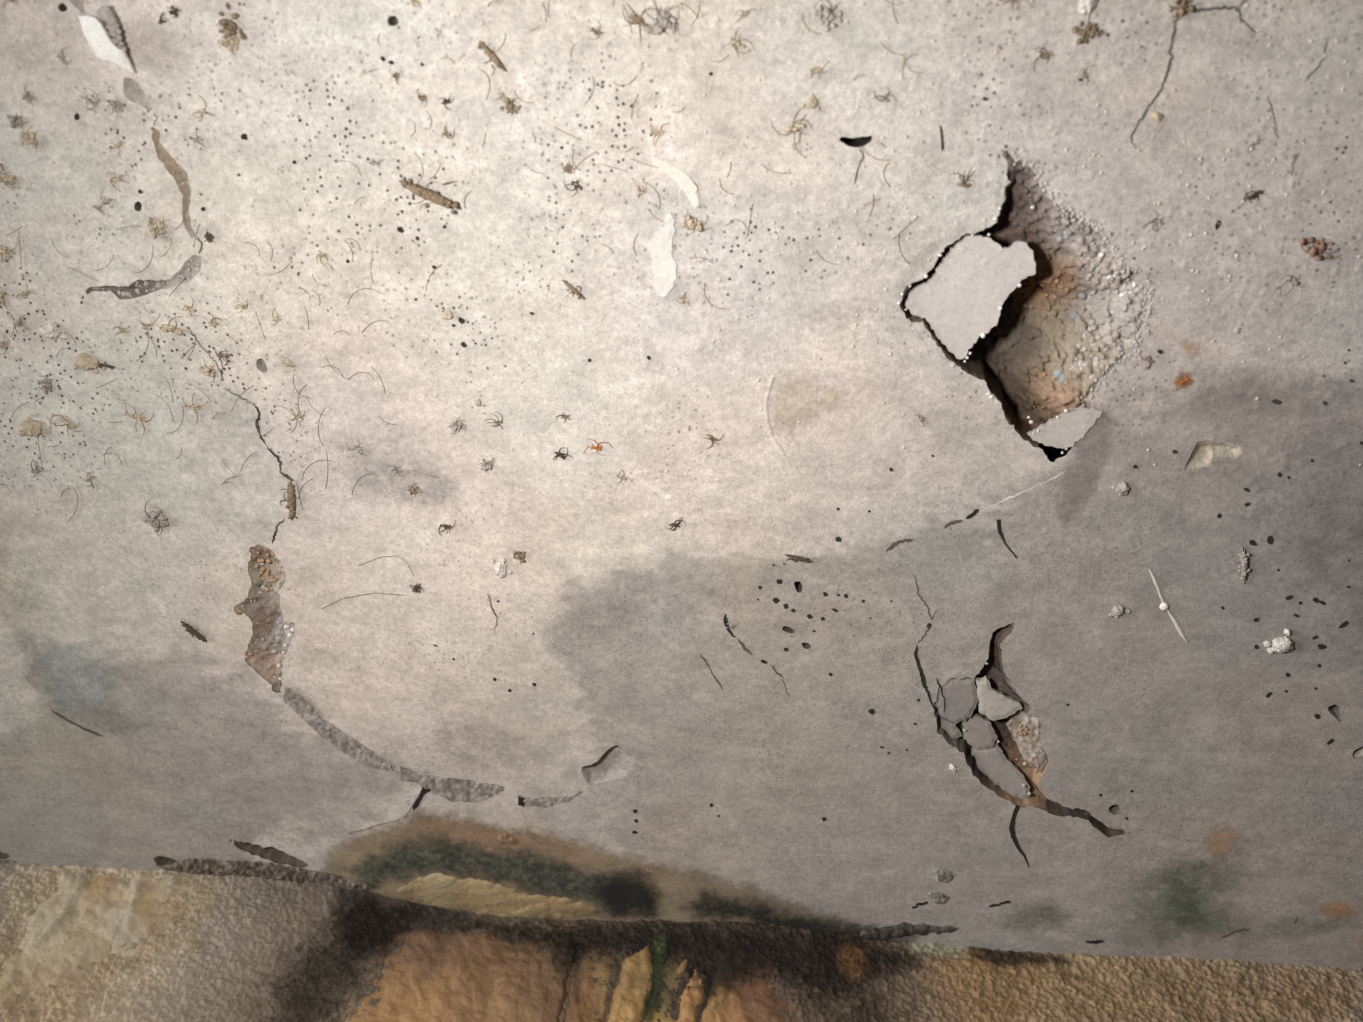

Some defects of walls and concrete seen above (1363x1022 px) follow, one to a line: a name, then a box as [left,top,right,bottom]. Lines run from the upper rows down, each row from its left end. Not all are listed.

crack [70,0,86,16]
crack [1130,0,1257,148]
crack [80,77,203,304]
spalling [897,148,1155,454]
crack [886,539,914,552]
crack [944,471,1065,559]
spalling [234,544,635,811]
crack [913,575,1125,867]
leakage [277,810,916,1022]
crack [1085,938,1104,946]
crack [1222,928,1251,938]